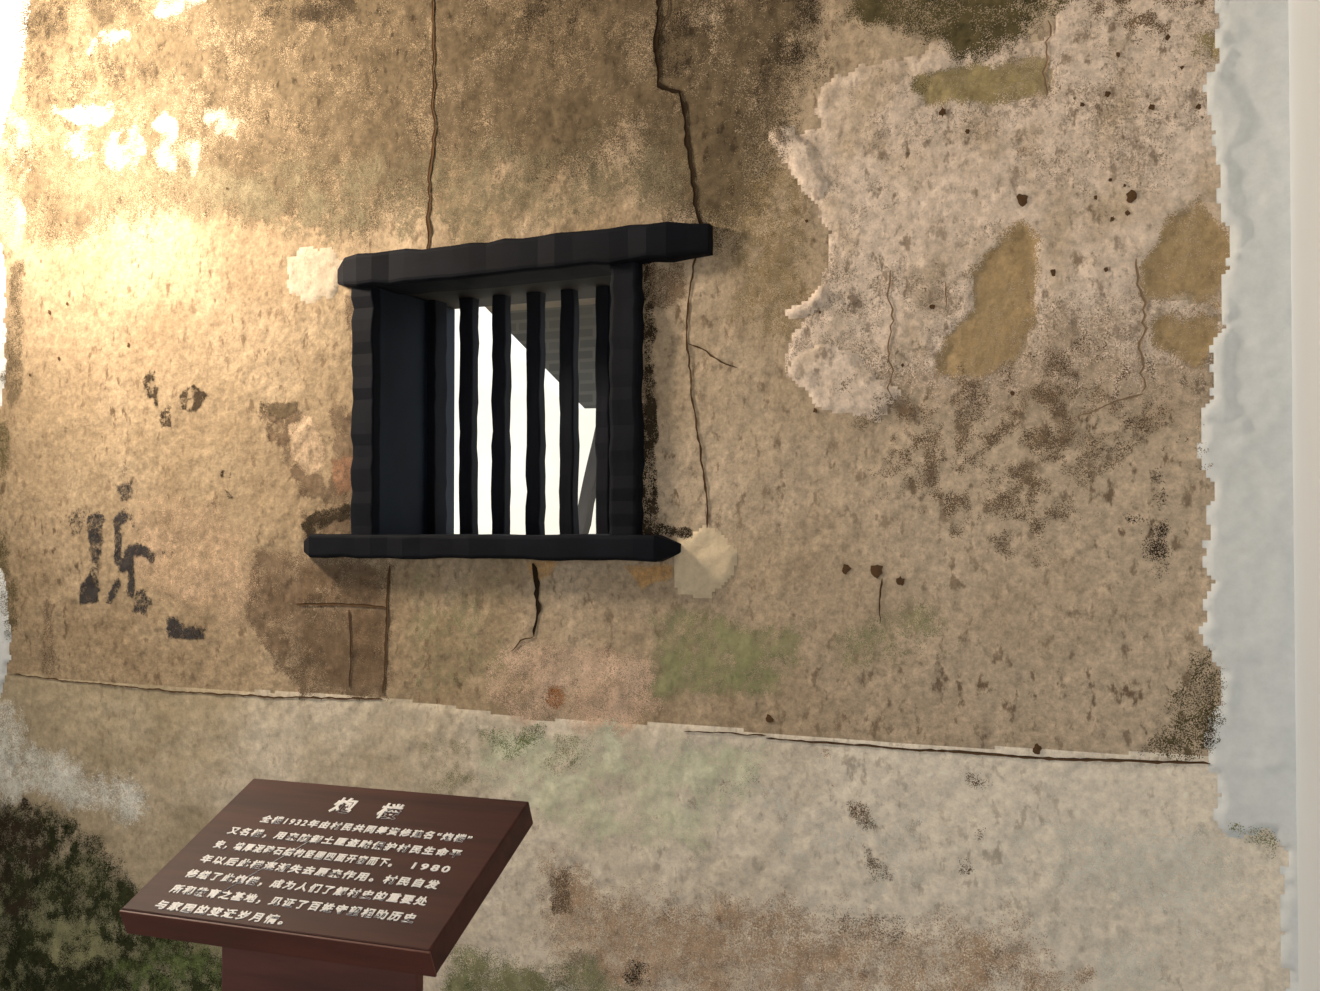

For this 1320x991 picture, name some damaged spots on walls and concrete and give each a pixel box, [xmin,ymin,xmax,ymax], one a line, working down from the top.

flaking render [86,28,132,56]
flaking render [49,100,201,177]
flaking render [152,0,206,19]
flaking render [203,107,245,142]
crack [426,0,436,249]
damp [0,0,1080,344]
crack [653,0,703,224]
flaking render [768,0,1230,440]
crack [686,258,737,528]
crack [512,560,559,651]
damp [0,690,151,829]
damp [415,717,1279,991]